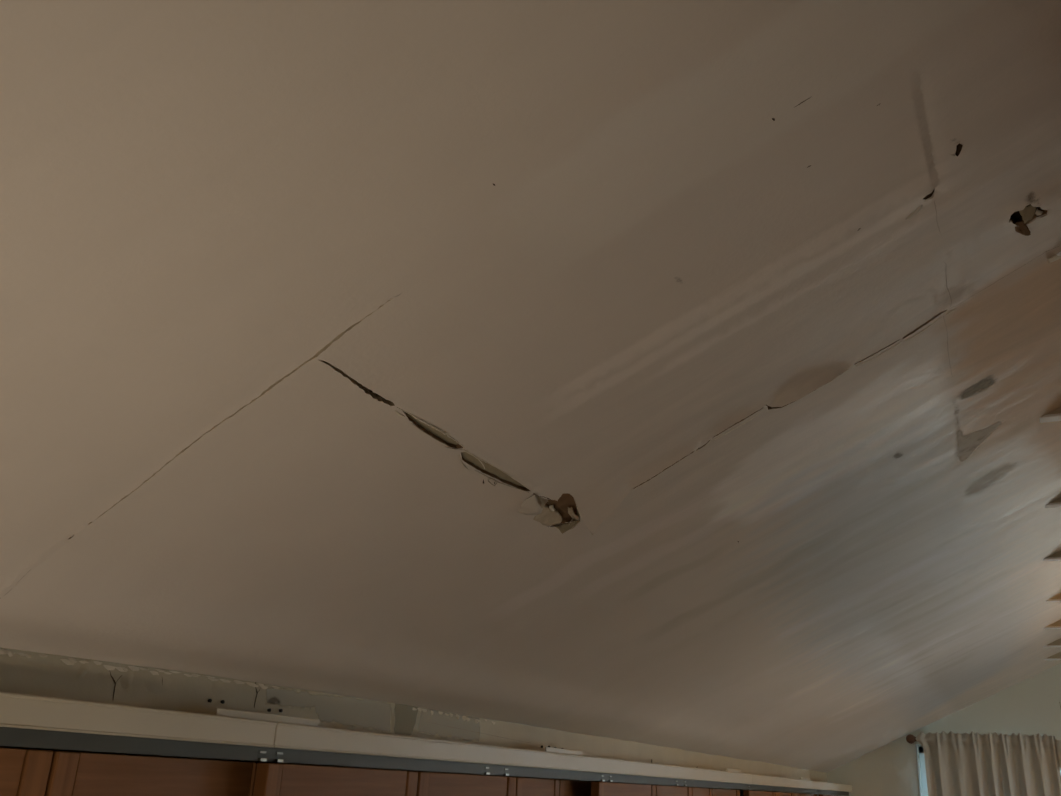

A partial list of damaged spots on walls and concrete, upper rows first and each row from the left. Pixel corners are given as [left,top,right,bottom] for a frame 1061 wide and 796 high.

crack [67,293,402,540]
leakage [961,377,995,399]